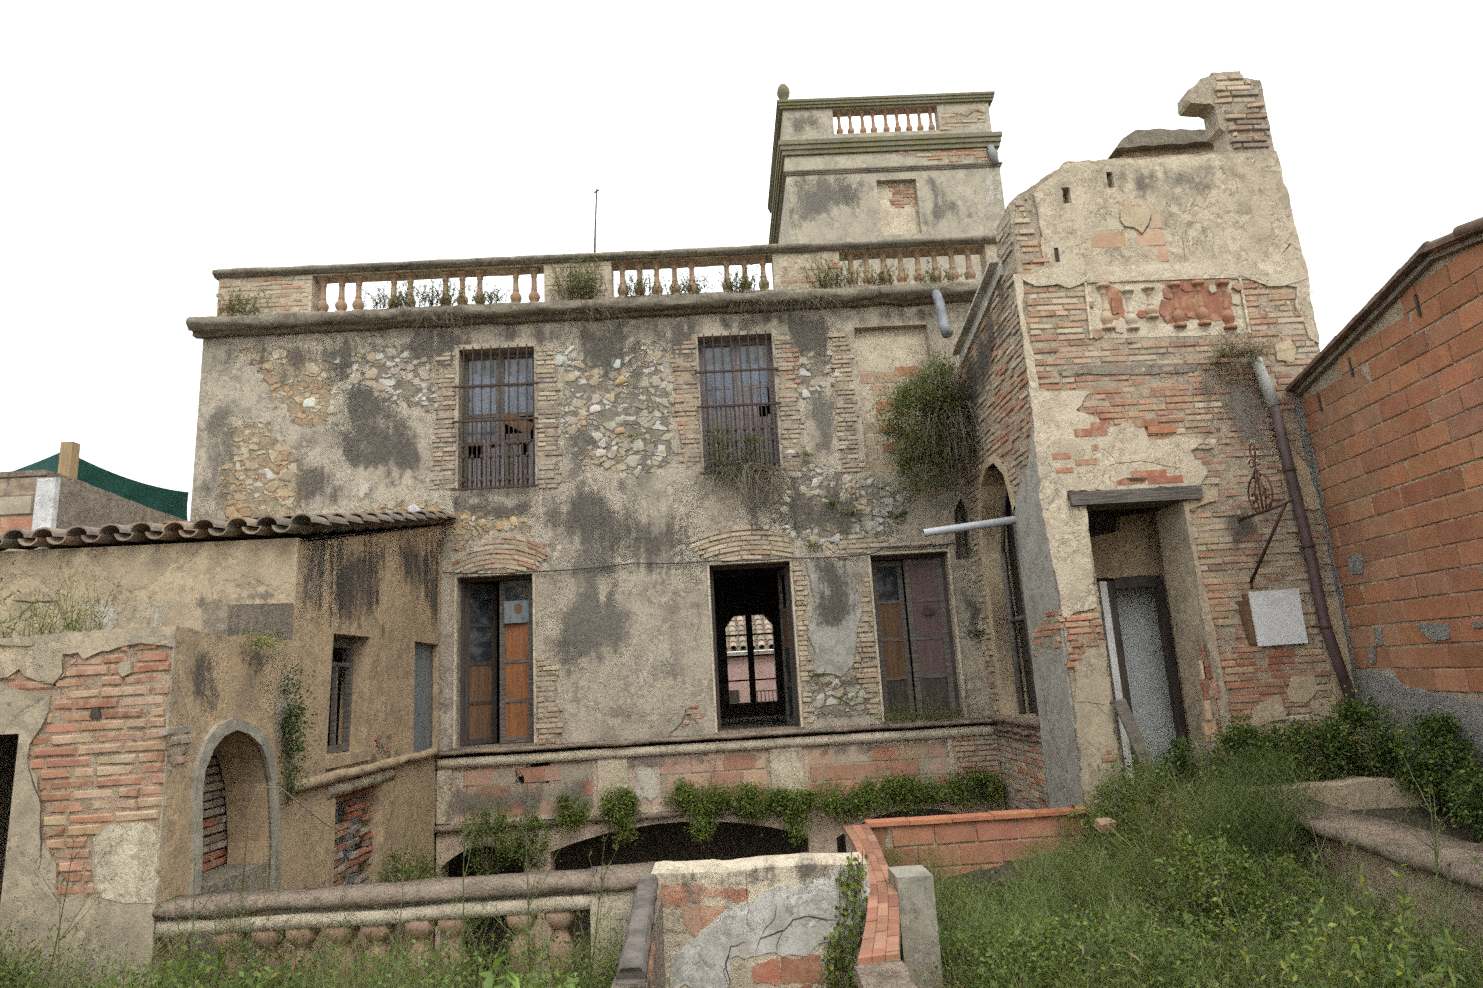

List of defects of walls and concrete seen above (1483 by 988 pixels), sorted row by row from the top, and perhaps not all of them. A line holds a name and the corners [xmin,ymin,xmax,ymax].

flaking render [536,347,563,489]
flaking render [669,336,702,467]
peeling [1013,153,1320,814]
damp [304,536,441,624]
damp [453,478,690,690]
peeling [690,526,949,723]
spalling [0,643,192,904]
flaking render [658,882,749,936]
crack [723,869,839,988]
flaking render [752,954,825,988]